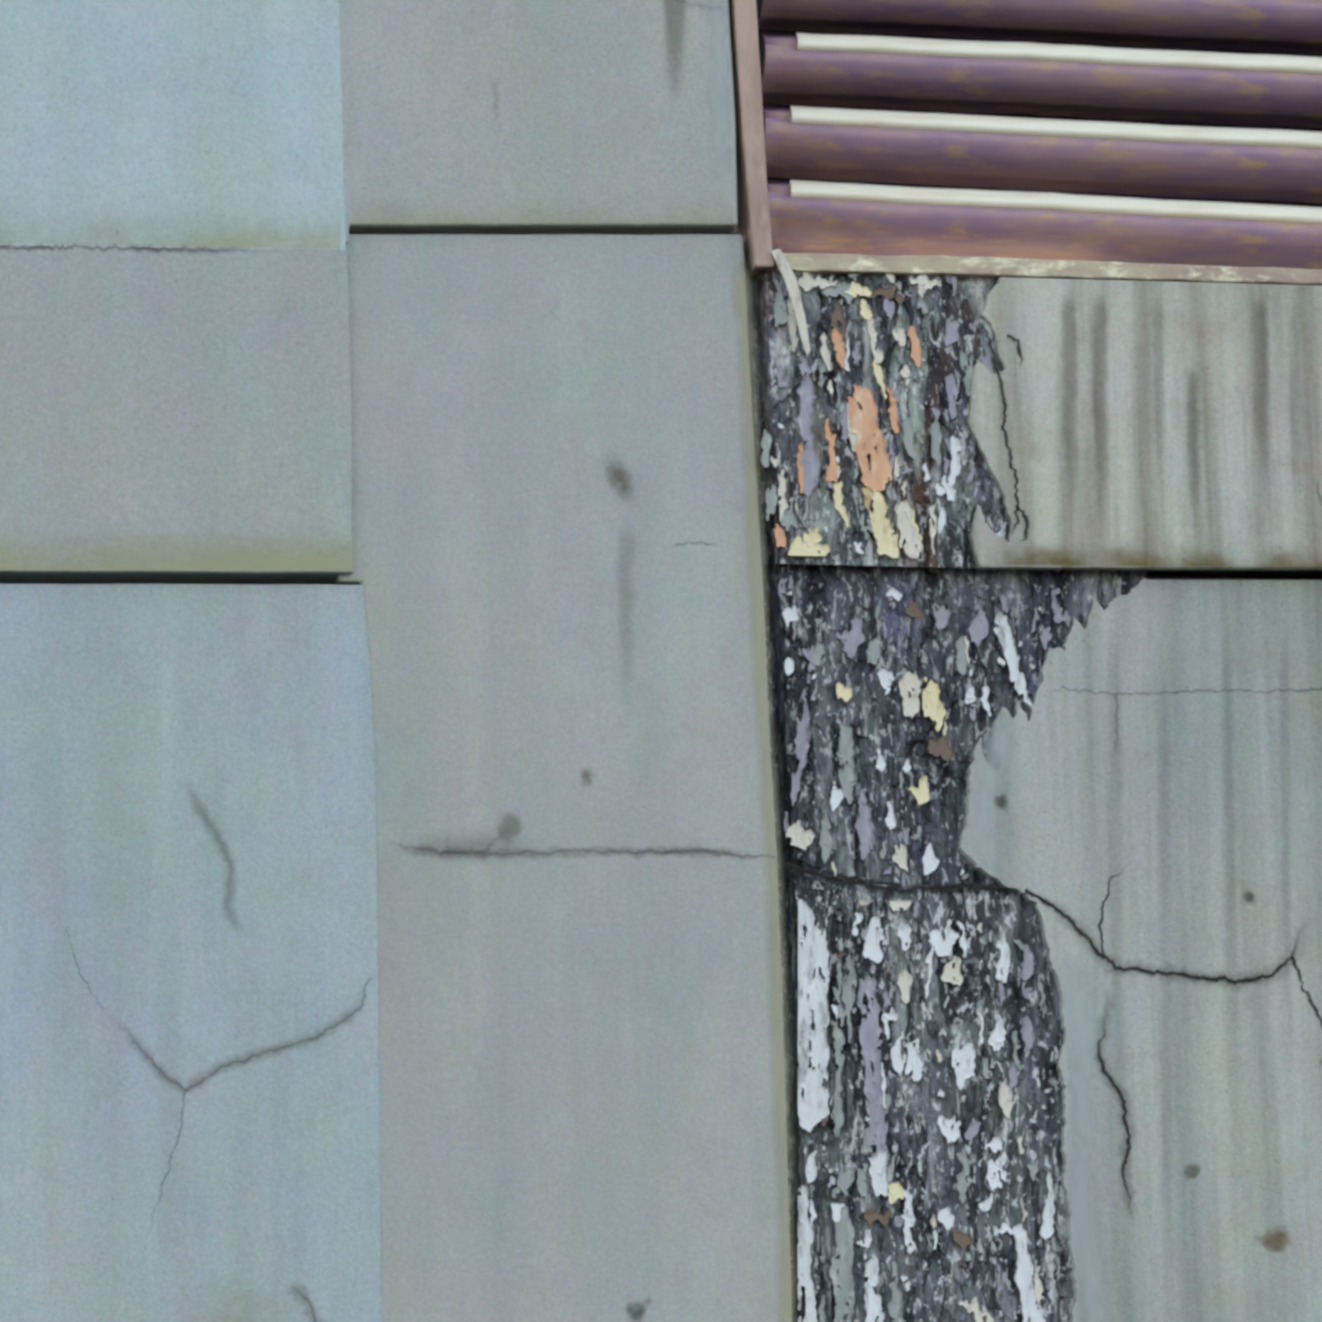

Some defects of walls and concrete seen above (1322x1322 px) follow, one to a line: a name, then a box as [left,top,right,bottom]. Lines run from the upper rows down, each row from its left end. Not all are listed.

spalling [751,263,1148,1322]
crack [777,859,1322,1022]
crack [1098,1033,1131,1186]